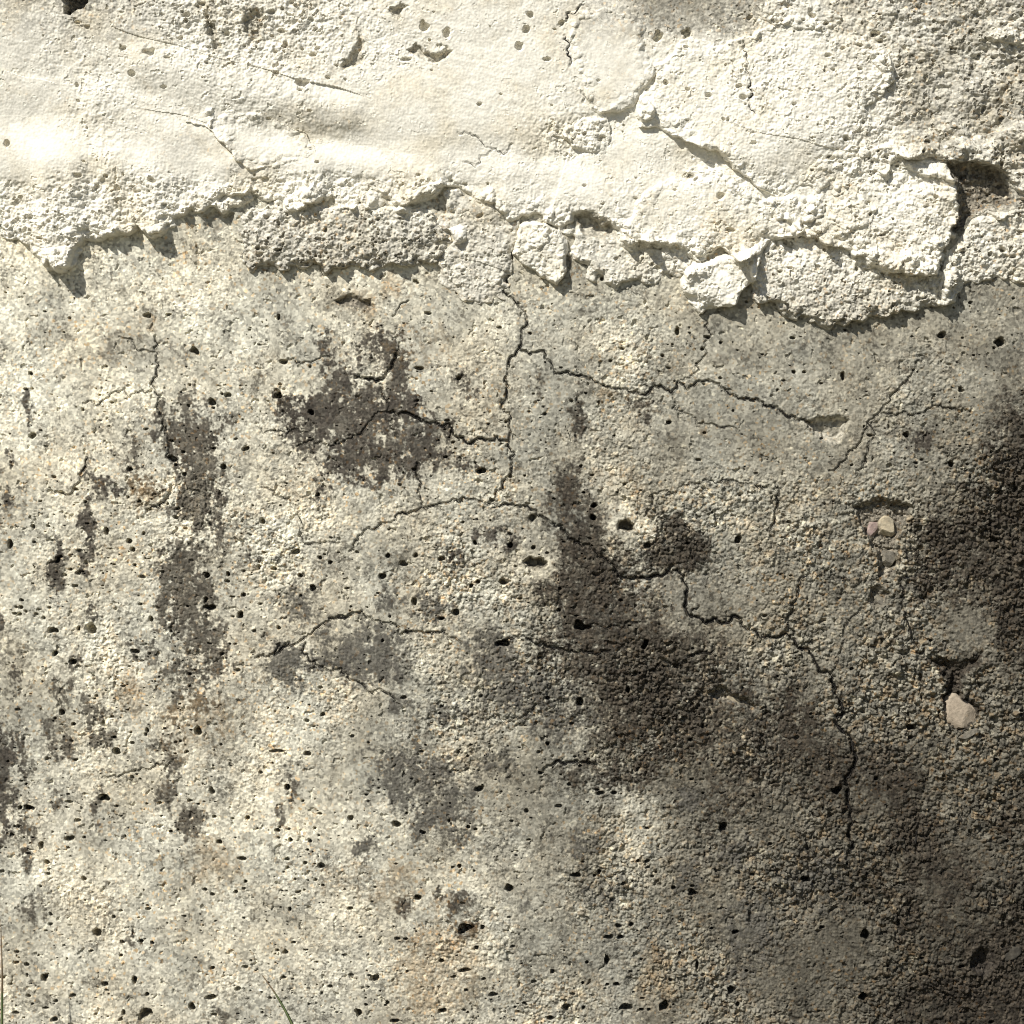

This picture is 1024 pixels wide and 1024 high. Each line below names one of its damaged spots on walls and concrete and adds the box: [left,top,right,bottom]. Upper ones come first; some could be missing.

flaking render [186,0,1024,330]
flaking render [38,243,84,274]
flaking render [96,219,177,242]
leakage [271,323,481,503]
leakage [567,398,588,442]
leakage [629,392,661,424]
crack [833,361,964,475]
crack [257,253,863,851]
leakage [906,378,1024,676]
crack [899,571,919,650]
leakage [261,456,1024,1024]